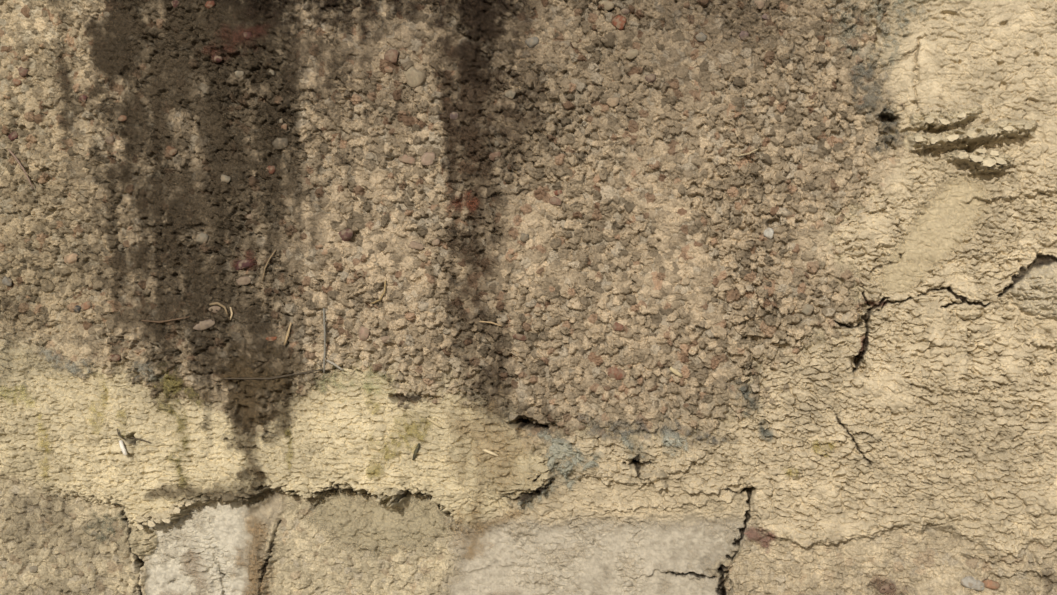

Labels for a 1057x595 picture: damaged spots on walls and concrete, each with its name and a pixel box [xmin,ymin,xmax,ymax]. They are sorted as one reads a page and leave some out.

damp [316,0,373,29]
damp [58,57,71,143]
damp [387,0,514,322]
peeling [903,107,1037,172]
damp [85,0,363,508]
spalling [881,177,987,292]
crack [835,255,1057,372]
crack [836,417,872,465]
crack [118,504,145,595]
spalling [135,492,268,595]
spalling [314,489,748,595]
crack [672,487,753,595]